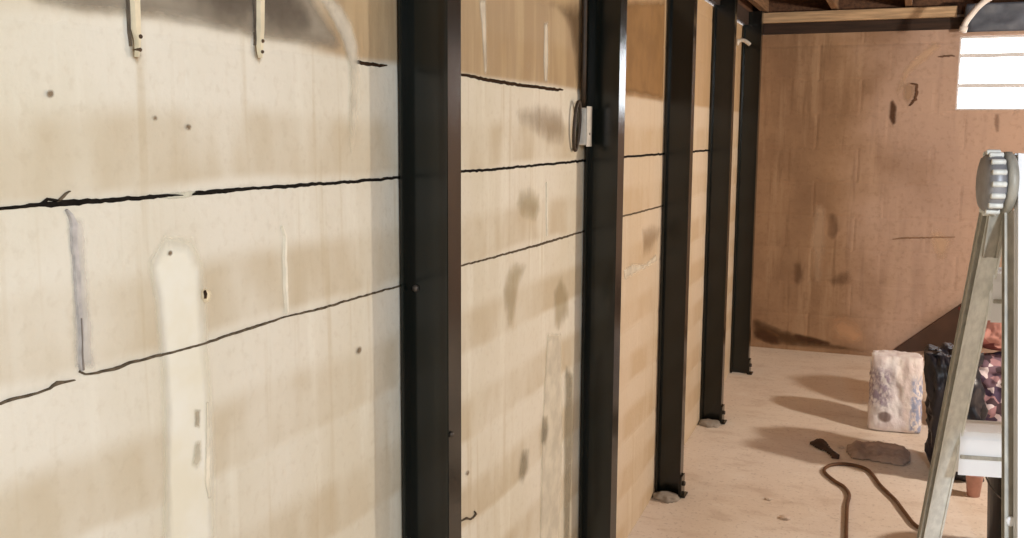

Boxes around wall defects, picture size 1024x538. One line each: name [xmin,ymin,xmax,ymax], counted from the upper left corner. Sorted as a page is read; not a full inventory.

crack [461,73,563,92]
crack [624,151,664,159]
crack [461,159,585,173]
crack [623,205,663,217]
crack [461,230,584,267]
crack [0,176,400,405]
damp [754,321,828,346]